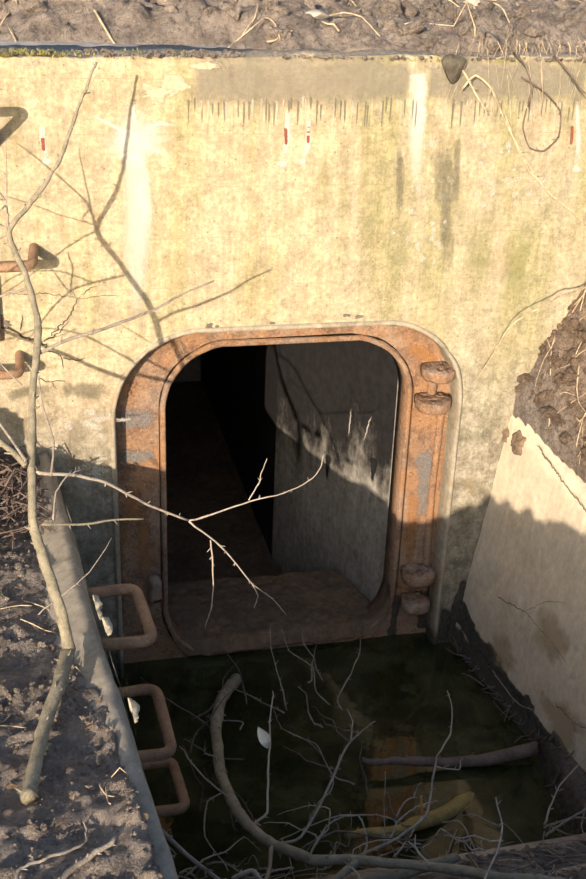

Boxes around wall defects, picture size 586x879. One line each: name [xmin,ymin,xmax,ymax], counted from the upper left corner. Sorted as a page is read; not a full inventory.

leakage [187,61,584,155]
crack [1,286,118,389]